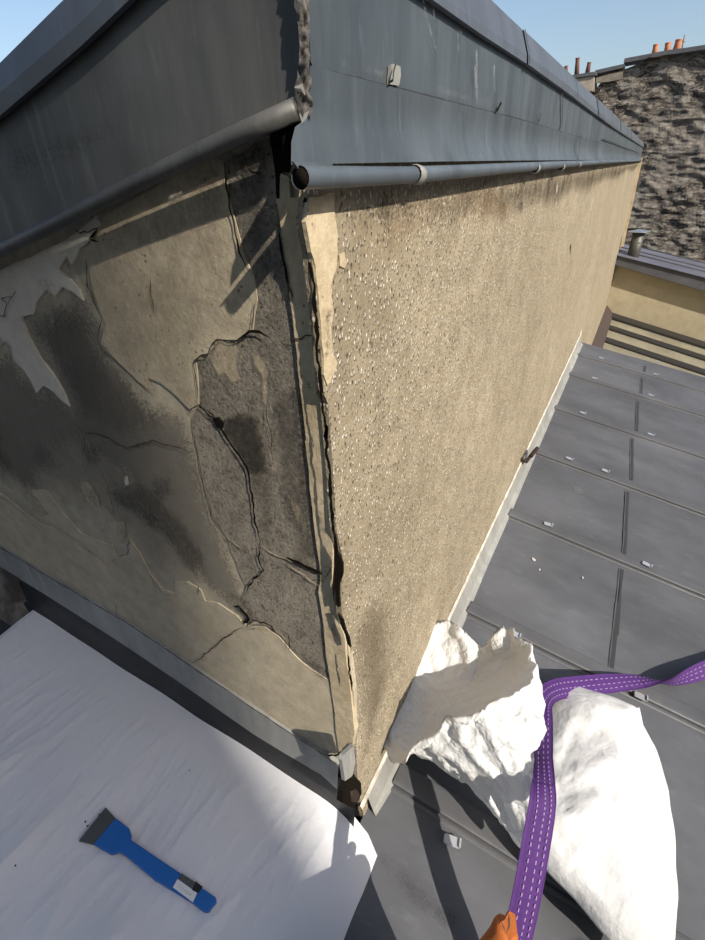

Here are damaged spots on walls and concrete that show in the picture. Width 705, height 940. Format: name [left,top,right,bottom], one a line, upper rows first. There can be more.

damp [0,296,245,611]
spalling [0,139,339,754]
crack [77,127,353,691]